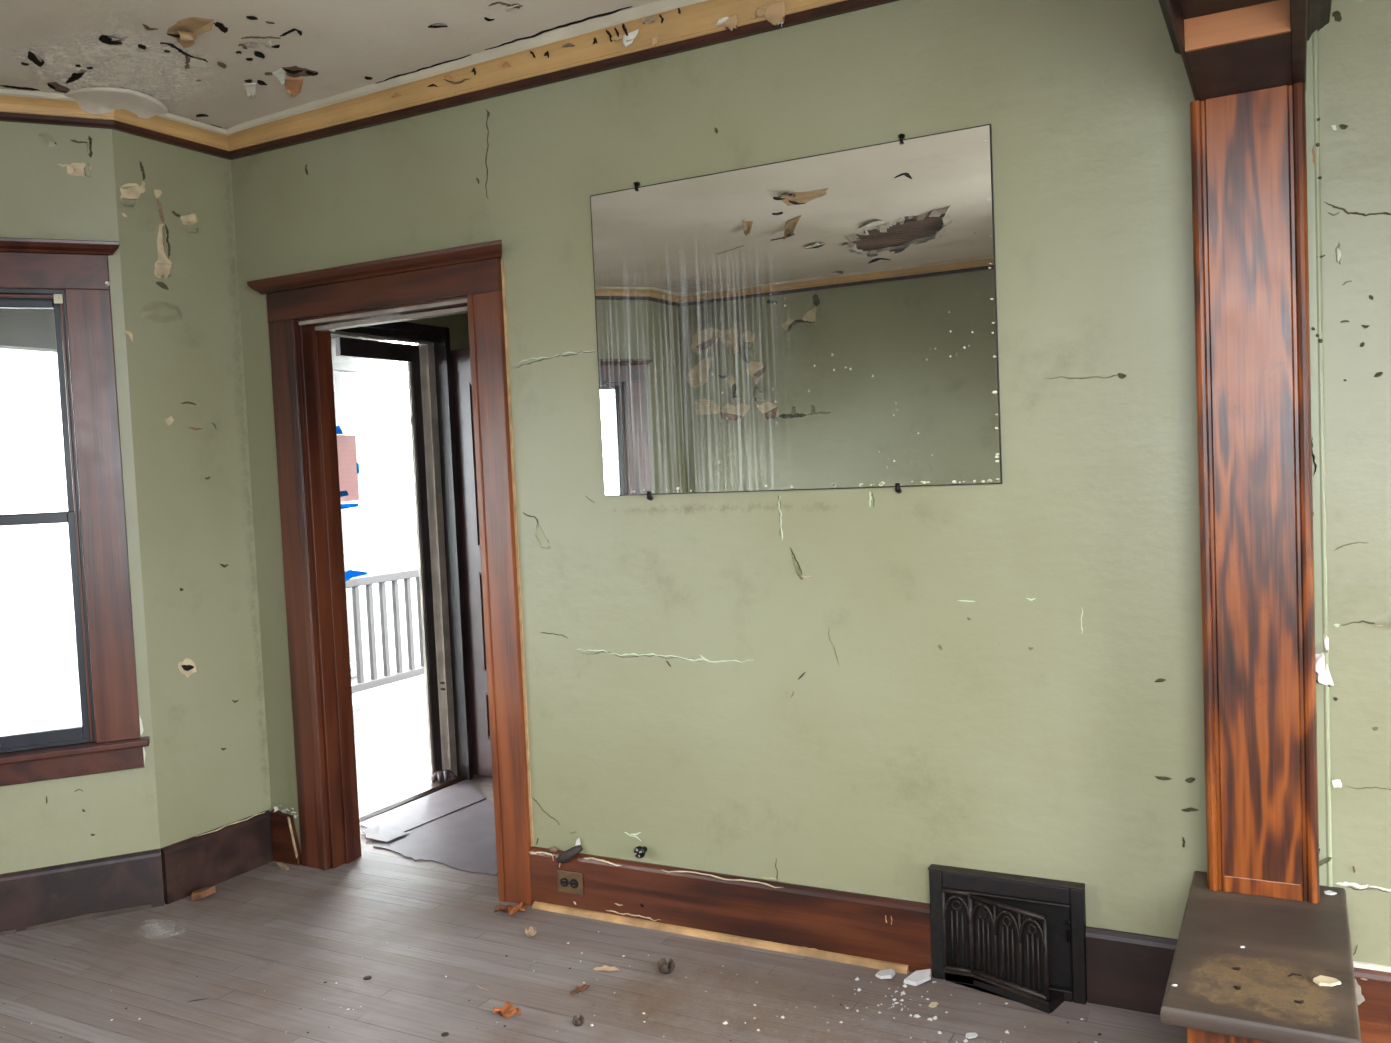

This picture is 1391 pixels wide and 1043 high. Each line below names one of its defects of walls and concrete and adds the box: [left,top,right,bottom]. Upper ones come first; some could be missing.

peeling [479,2,523,22]
peeling [593,8,681,46]
peeling [138,16,318,98]
peeling [47,65,93,93]
peeling [57,135,93,177]
crack [476,109,490,198]
peeling [120,161,198,290]
crack [1325,202,1391,217]
spalling [178,658,197,678]
crack [542,632,748,667]
peeling [1315,634,1334,687]